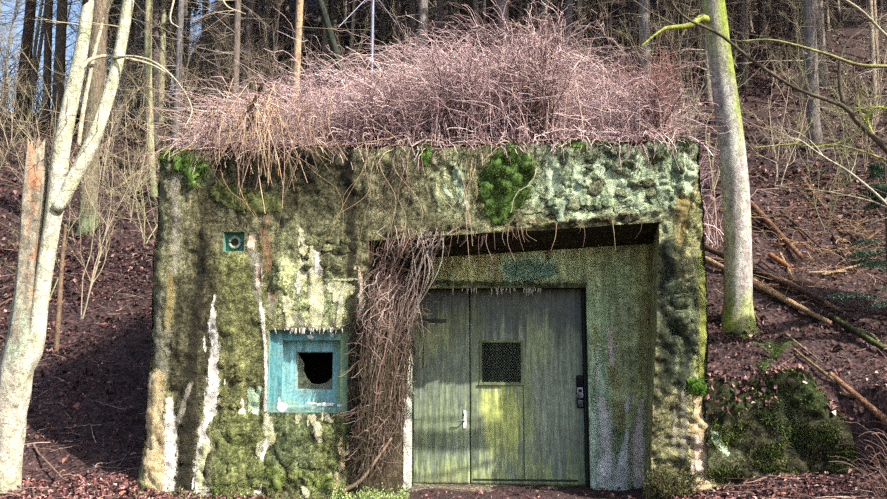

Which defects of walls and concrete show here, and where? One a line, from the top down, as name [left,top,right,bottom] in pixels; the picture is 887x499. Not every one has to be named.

rust [259,216,274,271]
flaking render [301,236,351,272]
water stain [659,238,730,490]